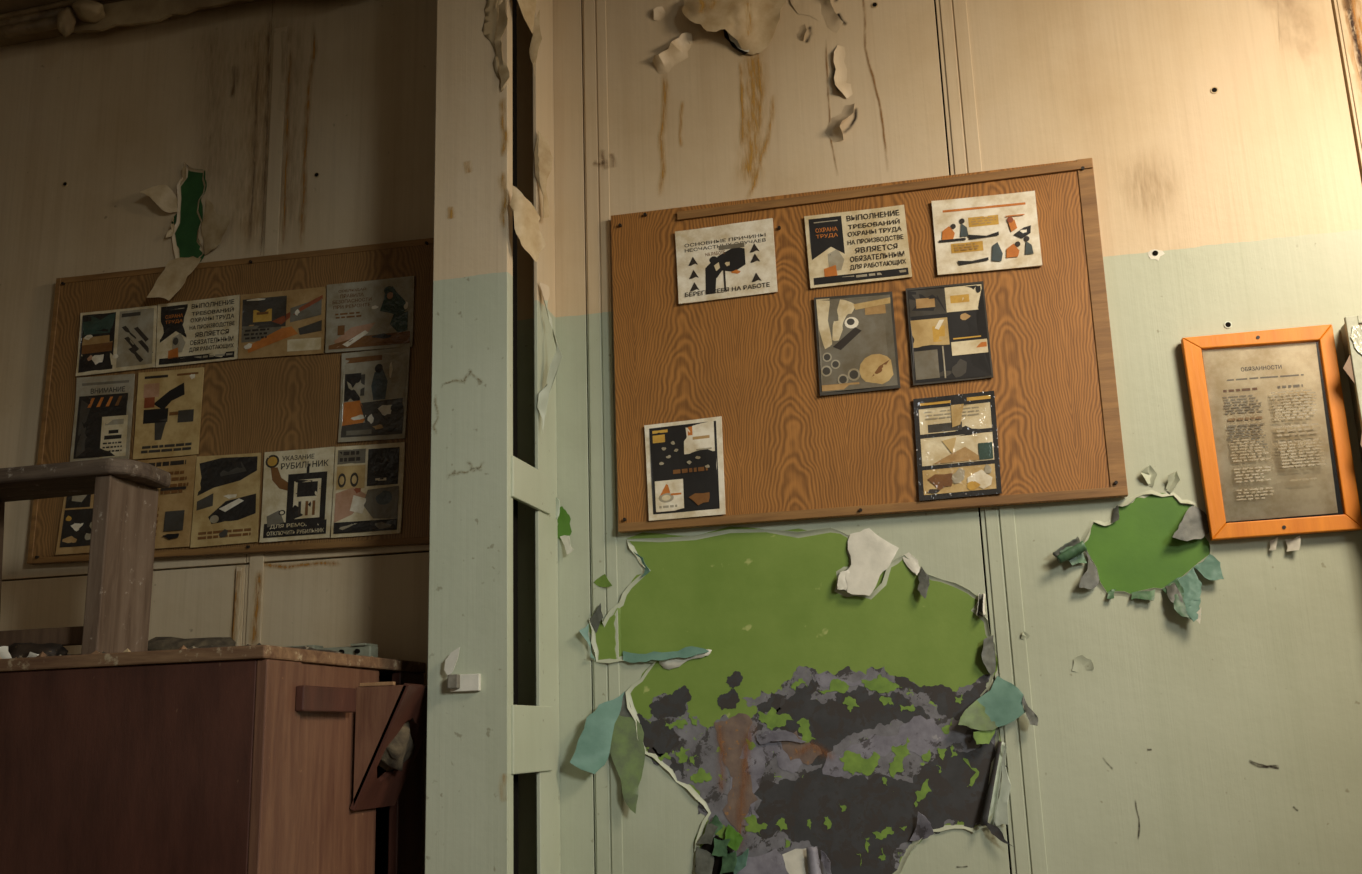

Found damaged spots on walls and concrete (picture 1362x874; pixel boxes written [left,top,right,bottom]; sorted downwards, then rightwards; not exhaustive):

peeling [482,0,542,92]
peeling [680,0,786,55]
corrosion [741,58,774,190]
peeling [796,0,857,143]
peeling [140,162,231,301]
peeling [510,131,553,262]
peeling [537,282,563,433]
peeling [1343,354,1355,383]
peeling [1053,490,1224,624]
peeling [570,526,1038,874]